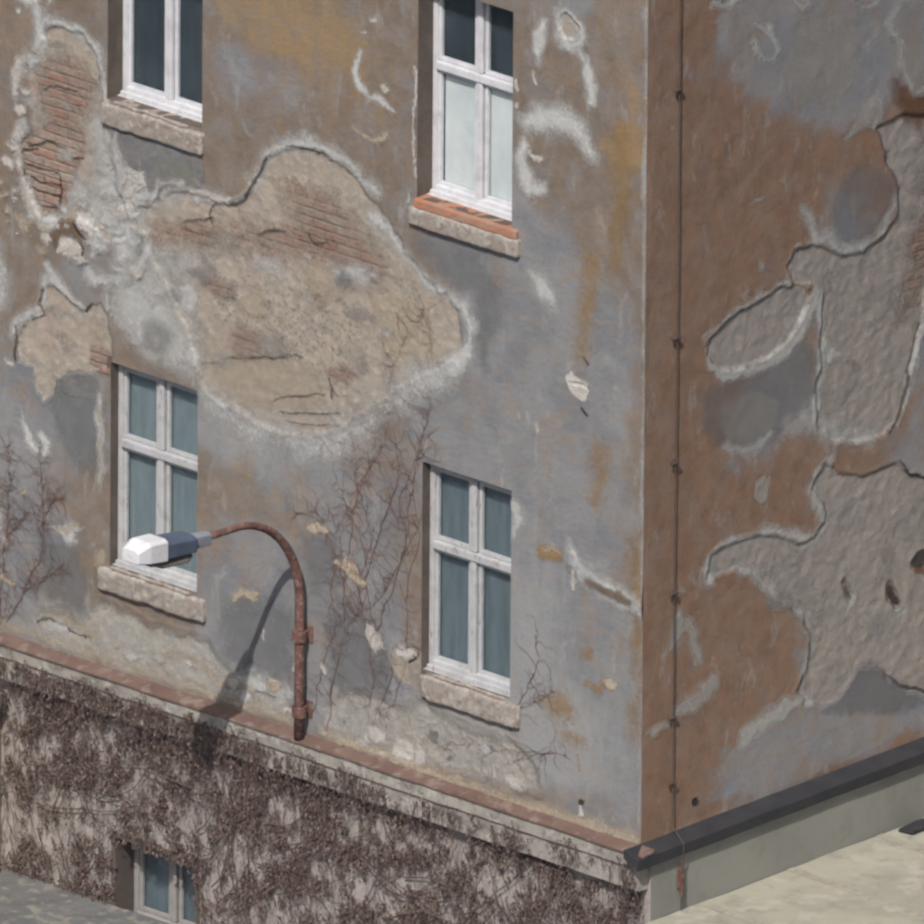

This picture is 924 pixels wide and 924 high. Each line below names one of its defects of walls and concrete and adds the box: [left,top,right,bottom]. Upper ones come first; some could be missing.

peeling [555,8,586,53]
peeling [0,0,479,488]
spalling [565,371,589,416]
peeling [307,522,329,535]
peeling [333,556,367,586]
peeling [231,588,259,602]